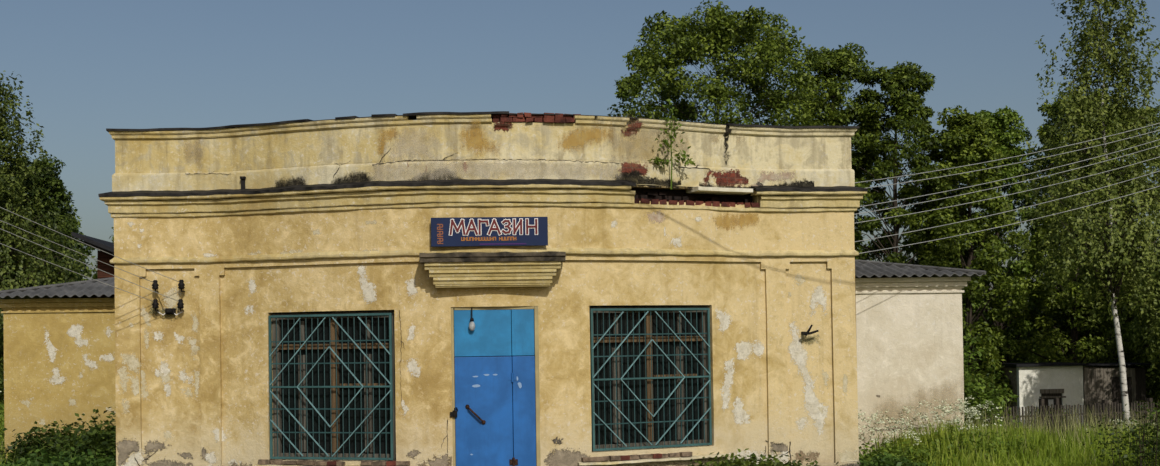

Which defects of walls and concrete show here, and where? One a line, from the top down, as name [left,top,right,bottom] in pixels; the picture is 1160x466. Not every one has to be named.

flaking render [491,112,581,132]
flaking render [618,161,795,247]
peeling [357,265,378,304]
peeling [715,309,733,335]
peeling [719,340,765,425]
peeling [788,321,829,436]
flaking render [115,427,252,466]
flaking render [386,449,452,466]
flaking render [544,437,821,466]
peeling [838,449,861,466]